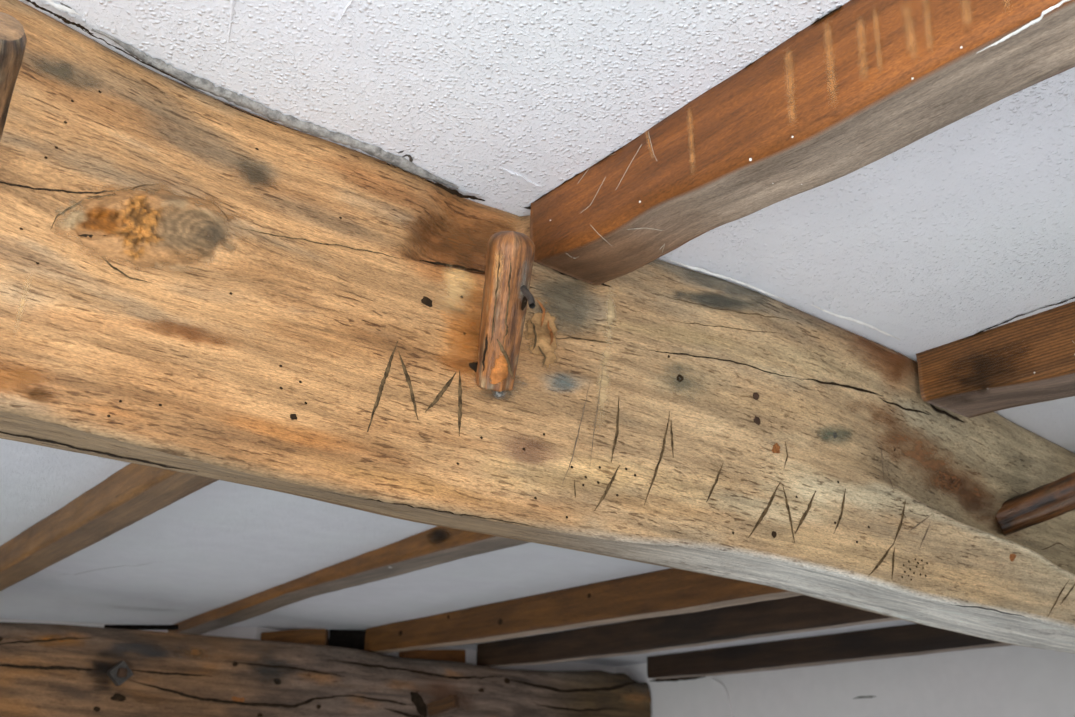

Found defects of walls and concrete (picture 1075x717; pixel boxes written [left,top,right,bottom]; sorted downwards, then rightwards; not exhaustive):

crack [656,293,796,334]
crack [556,336,608,344]
crack [641,349,930,415]